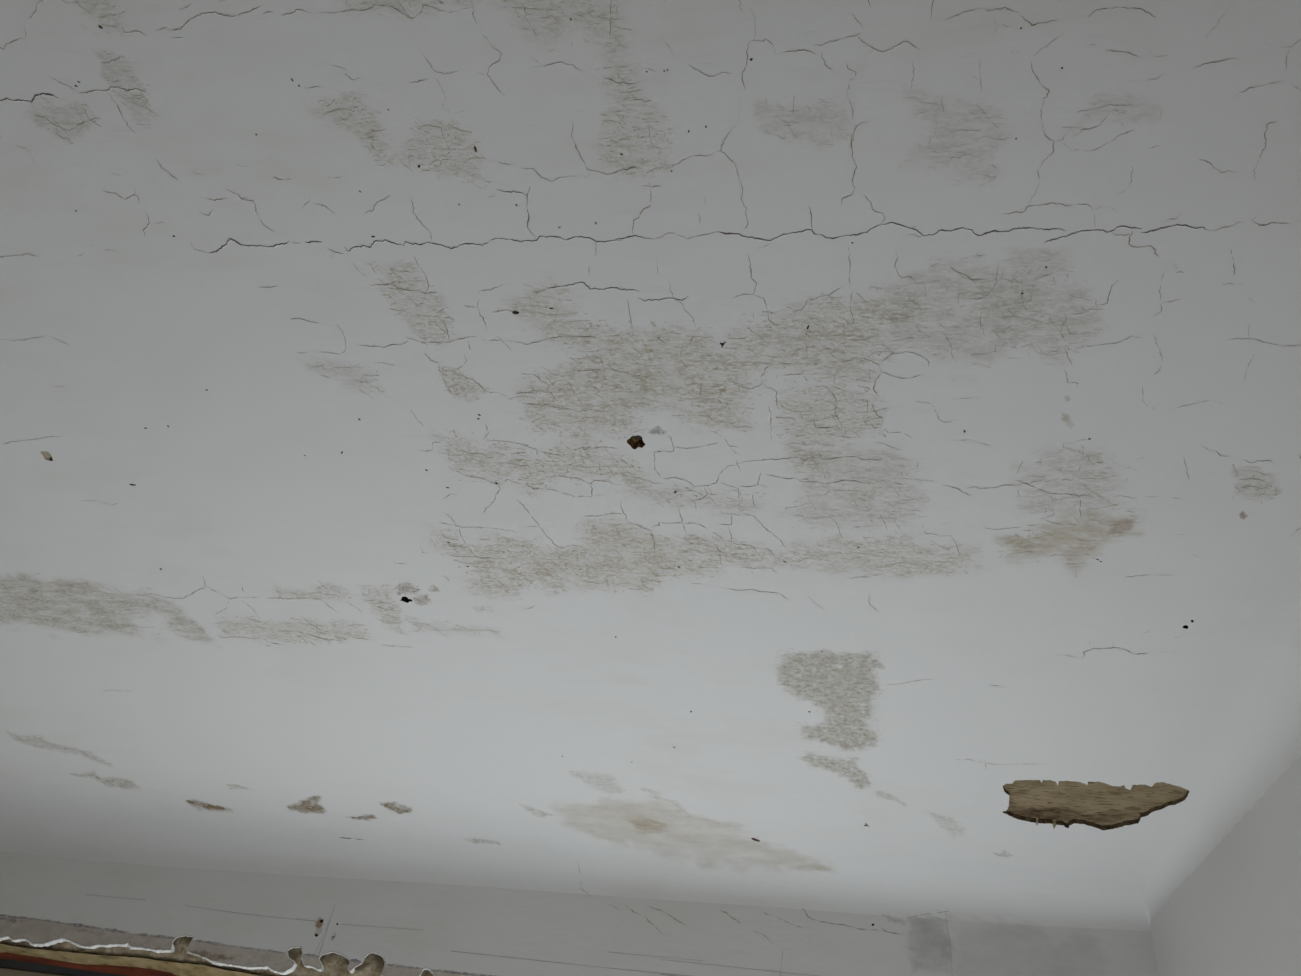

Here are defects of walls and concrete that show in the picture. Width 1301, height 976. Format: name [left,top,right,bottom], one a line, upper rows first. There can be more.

spalling [1003,780,1189,830]
spalling [0,935,385,976]